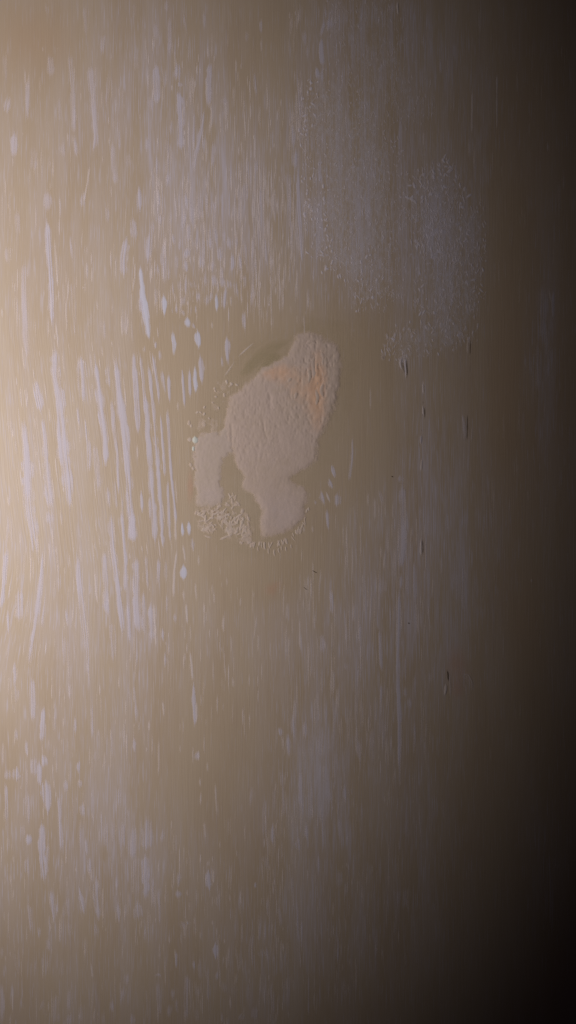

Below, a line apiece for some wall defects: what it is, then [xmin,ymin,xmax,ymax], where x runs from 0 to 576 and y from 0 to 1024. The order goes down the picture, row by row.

peeling [188,333,341,555]